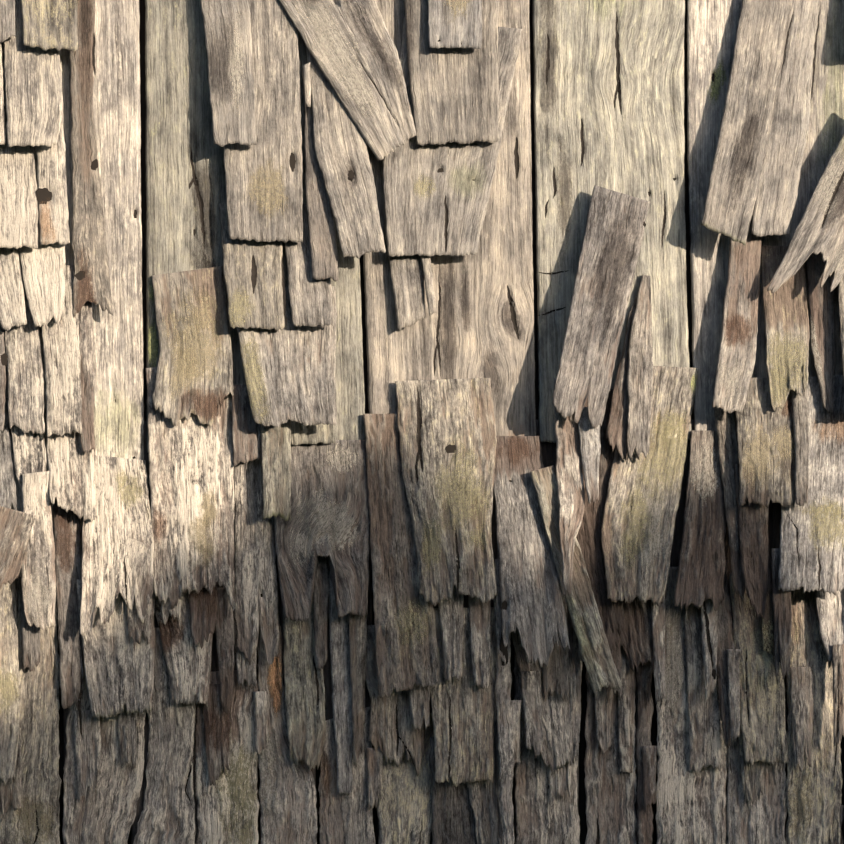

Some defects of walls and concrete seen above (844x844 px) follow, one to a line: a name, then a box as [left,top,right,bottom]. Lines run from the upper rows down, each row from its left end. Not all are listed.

crack [601,0,622,115]
crack [442,196,450,251]
crack [507,285,519,339]